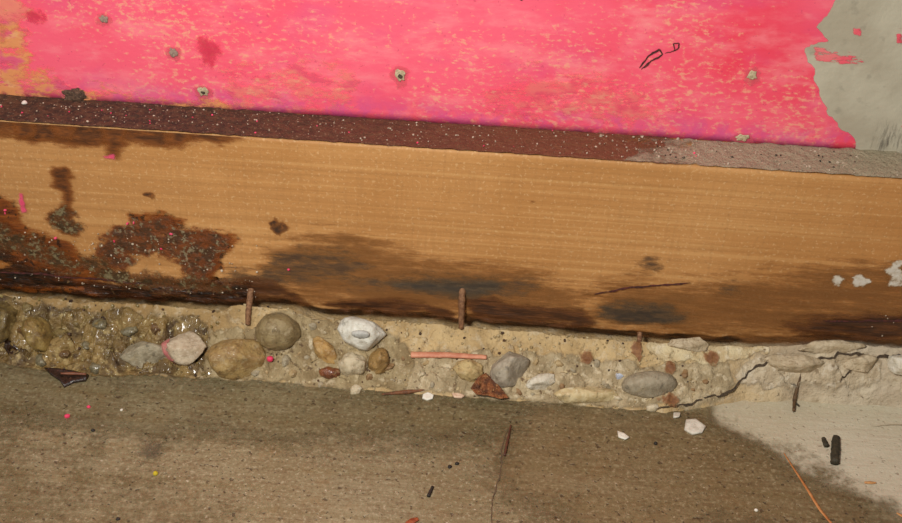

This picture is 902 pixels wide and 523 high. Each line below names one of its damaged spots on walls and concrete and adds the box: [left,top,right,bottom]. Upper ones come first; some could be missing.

leakage [0,121,241,159]
peeling [805,0,902,153]
leakage [0,167,902,345]
leakage [0,362,902,523]
crack [657,361,768,409]
crack [818,351,901,382]